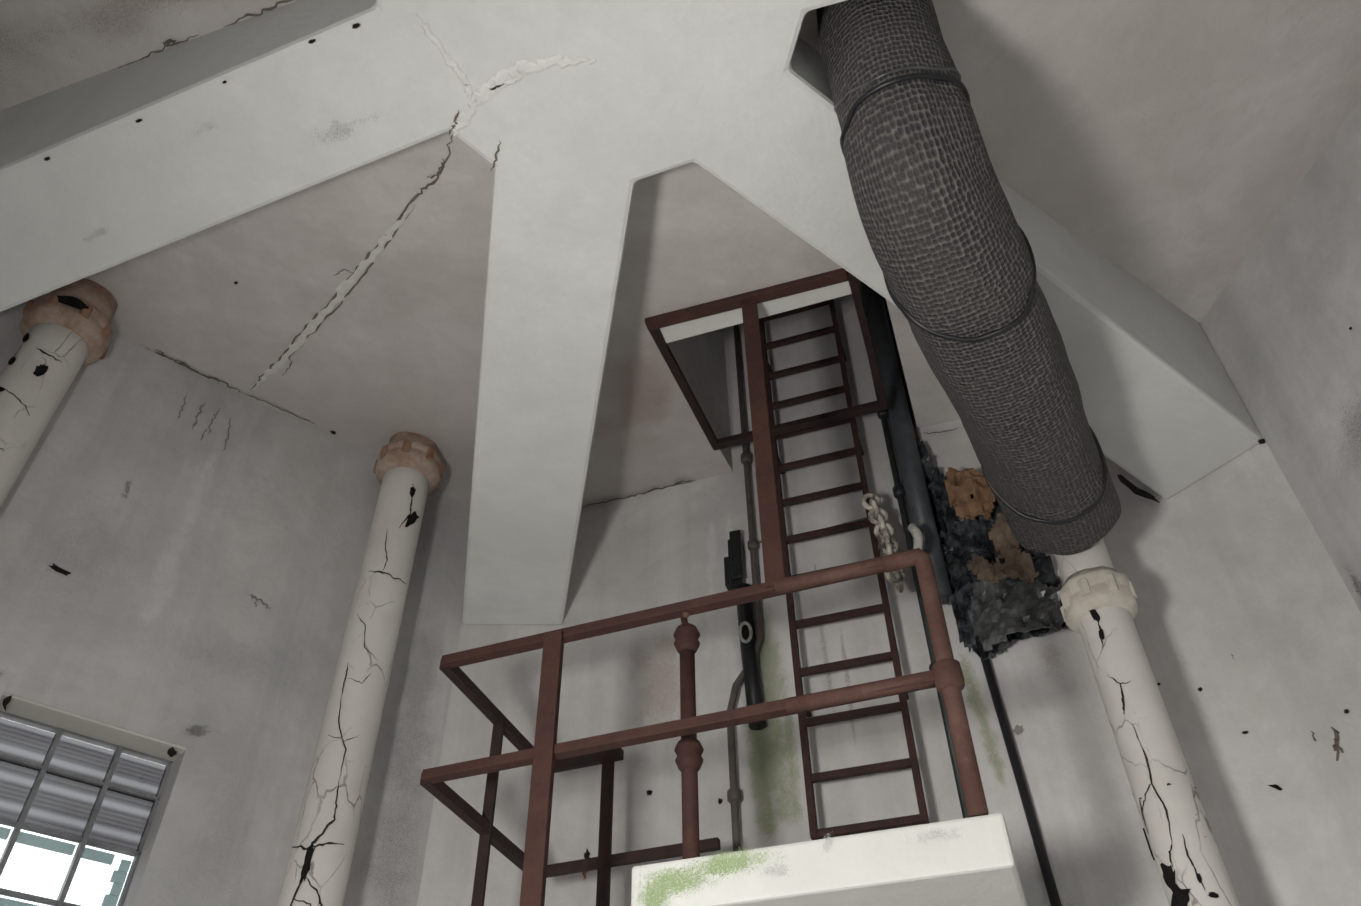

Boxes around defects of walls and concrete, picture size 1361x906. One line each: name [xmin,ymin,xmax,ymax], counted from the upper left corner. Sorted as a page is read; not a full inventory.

crack [104,0,293,74]
crack [4,345,62,416]
peeling [33,364,48,377]
crack [368,497,413,584]
crack [251,594,271,609]
crack [290,614,376,906]
damp [686,716,804,881]
crack [1098,622,1205,890]
damp [634,876,677,906]
peeling [1143,828,1219,906]